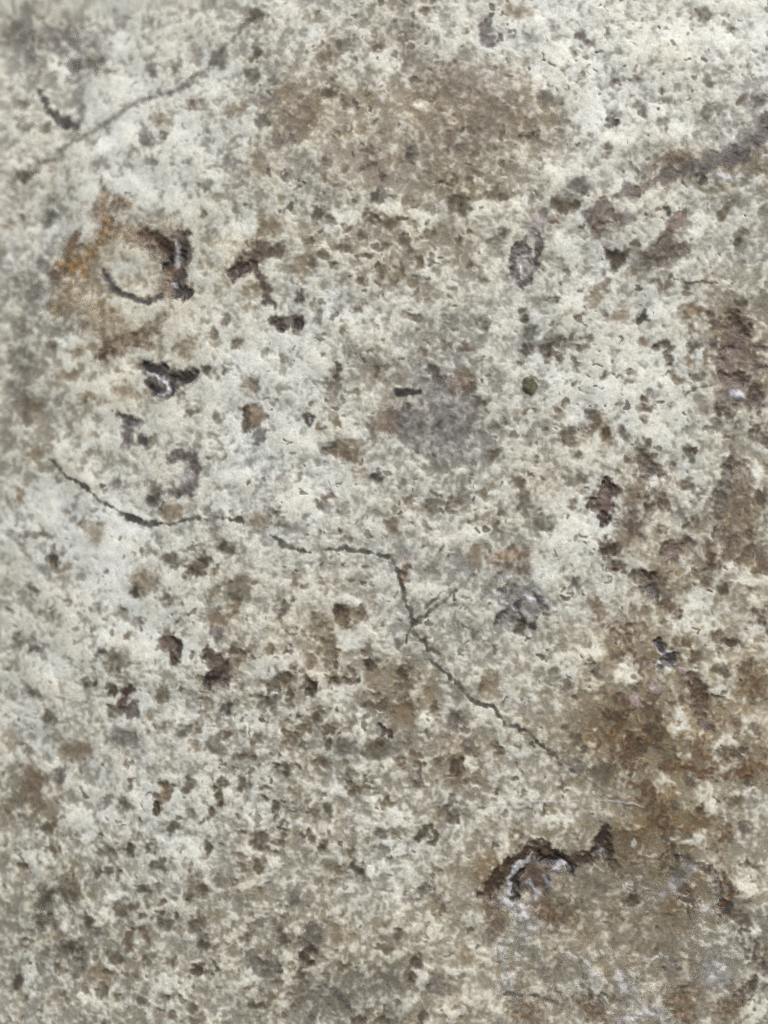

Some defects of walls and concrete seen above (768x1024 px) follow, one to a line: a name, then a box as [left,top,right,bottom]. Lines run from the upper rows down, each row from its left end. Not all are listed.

crack [63,473,244,526]
crack [272,536,548,751]
spalling [477,824,616,984]
peeling [565,951,663,1021]